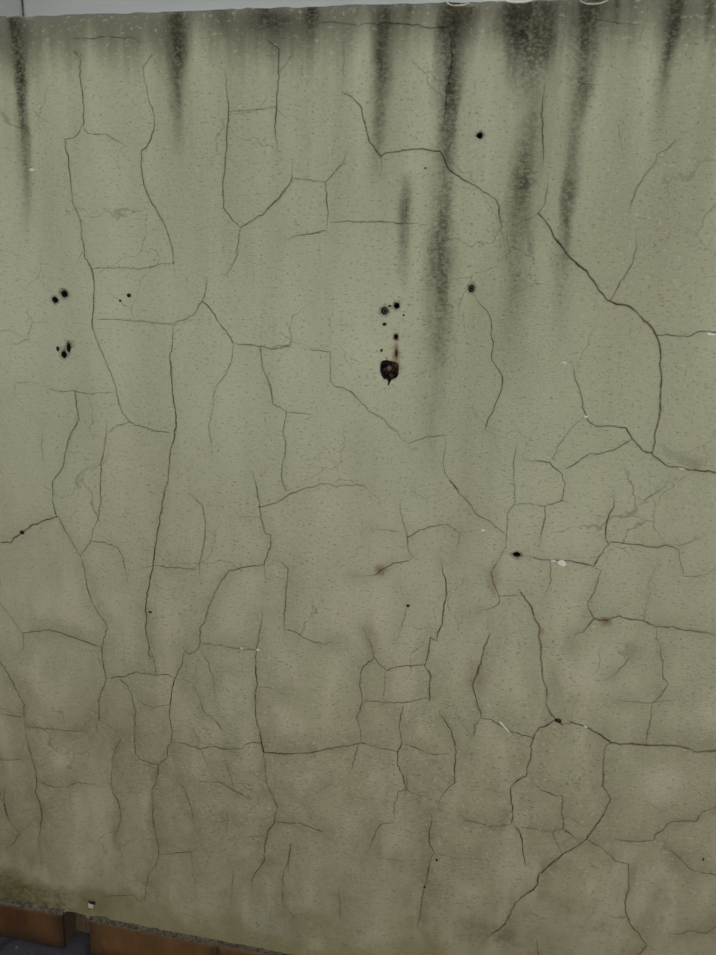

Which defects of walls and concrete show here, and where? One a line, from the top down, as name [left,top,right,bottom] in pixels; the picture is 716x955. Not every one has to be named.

leakage [9,17,27,133]
leakage [171,11,184,90]
leakage [439,2,472,156]
leakage [502,0,552,56]
leakage [579,0,601,97]
leakage [665,0,683,61]
crack [222,80,402,257]
crack [347,94,501,223]
crack [538,196,716,473]
crack [1,210,242,859]
crack [540,509,681,567]
crack [236,568,716,952]